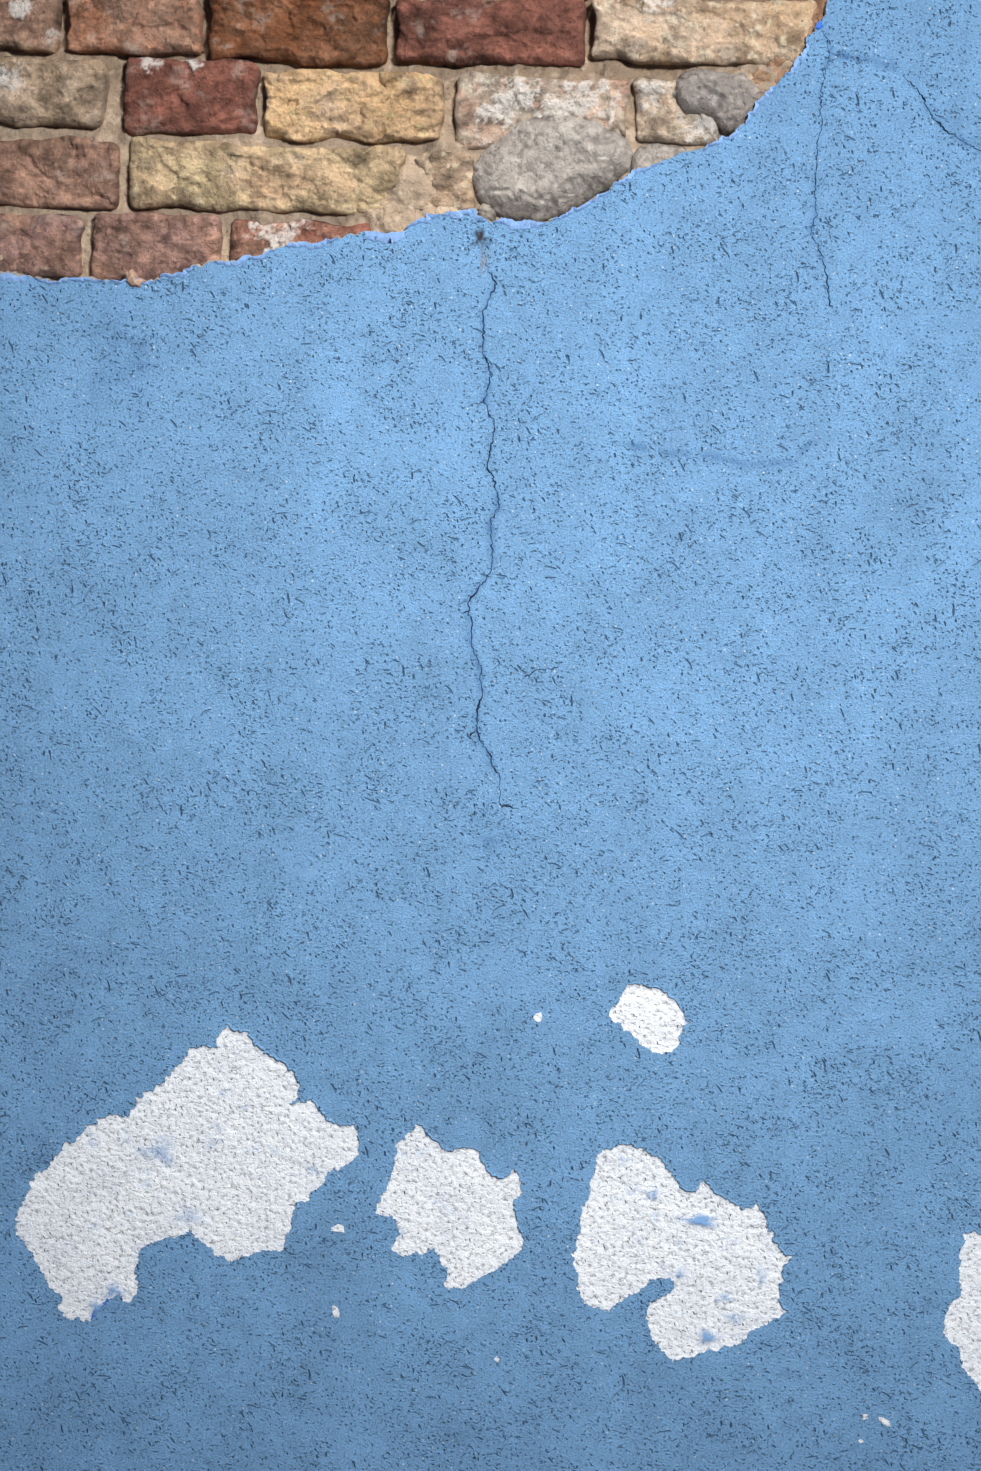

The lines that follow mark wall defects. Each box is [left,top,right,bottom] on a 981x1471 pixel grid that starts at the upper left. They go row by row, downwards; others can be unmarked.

flaking render [0,0,827,288]
crack [458,240,519,810]
peeling [609,981,690,1054]
peeling [15,1023,360,1322]
peeling [375,1122,526,1289]
peeling [571,1142,796,1362]
peeling [942,1230,981,1391]